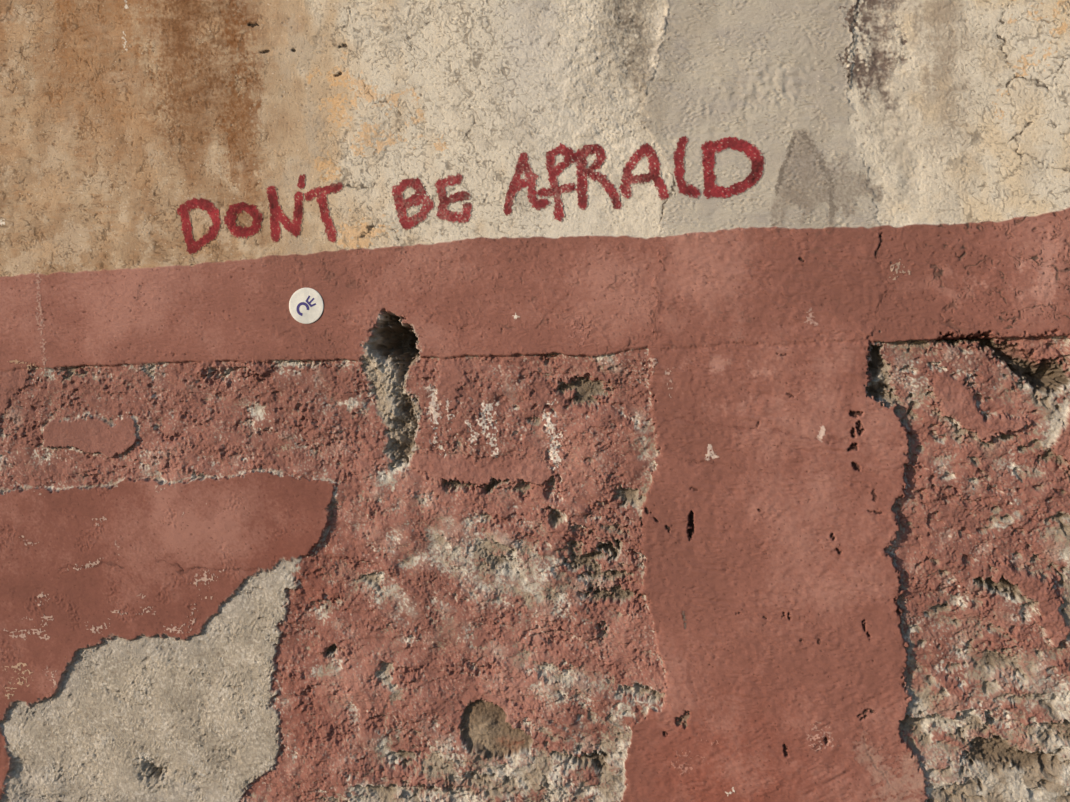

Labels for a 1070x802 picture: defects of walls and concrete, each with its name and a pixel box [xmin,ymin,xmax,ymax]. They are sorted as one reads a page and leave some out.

leakage [482,0,1010,228]
crack [996,0,1070,172]
spalling [0,317,672,802]
spalling [806,340,1070,802]
spalling [663,711,690,737]